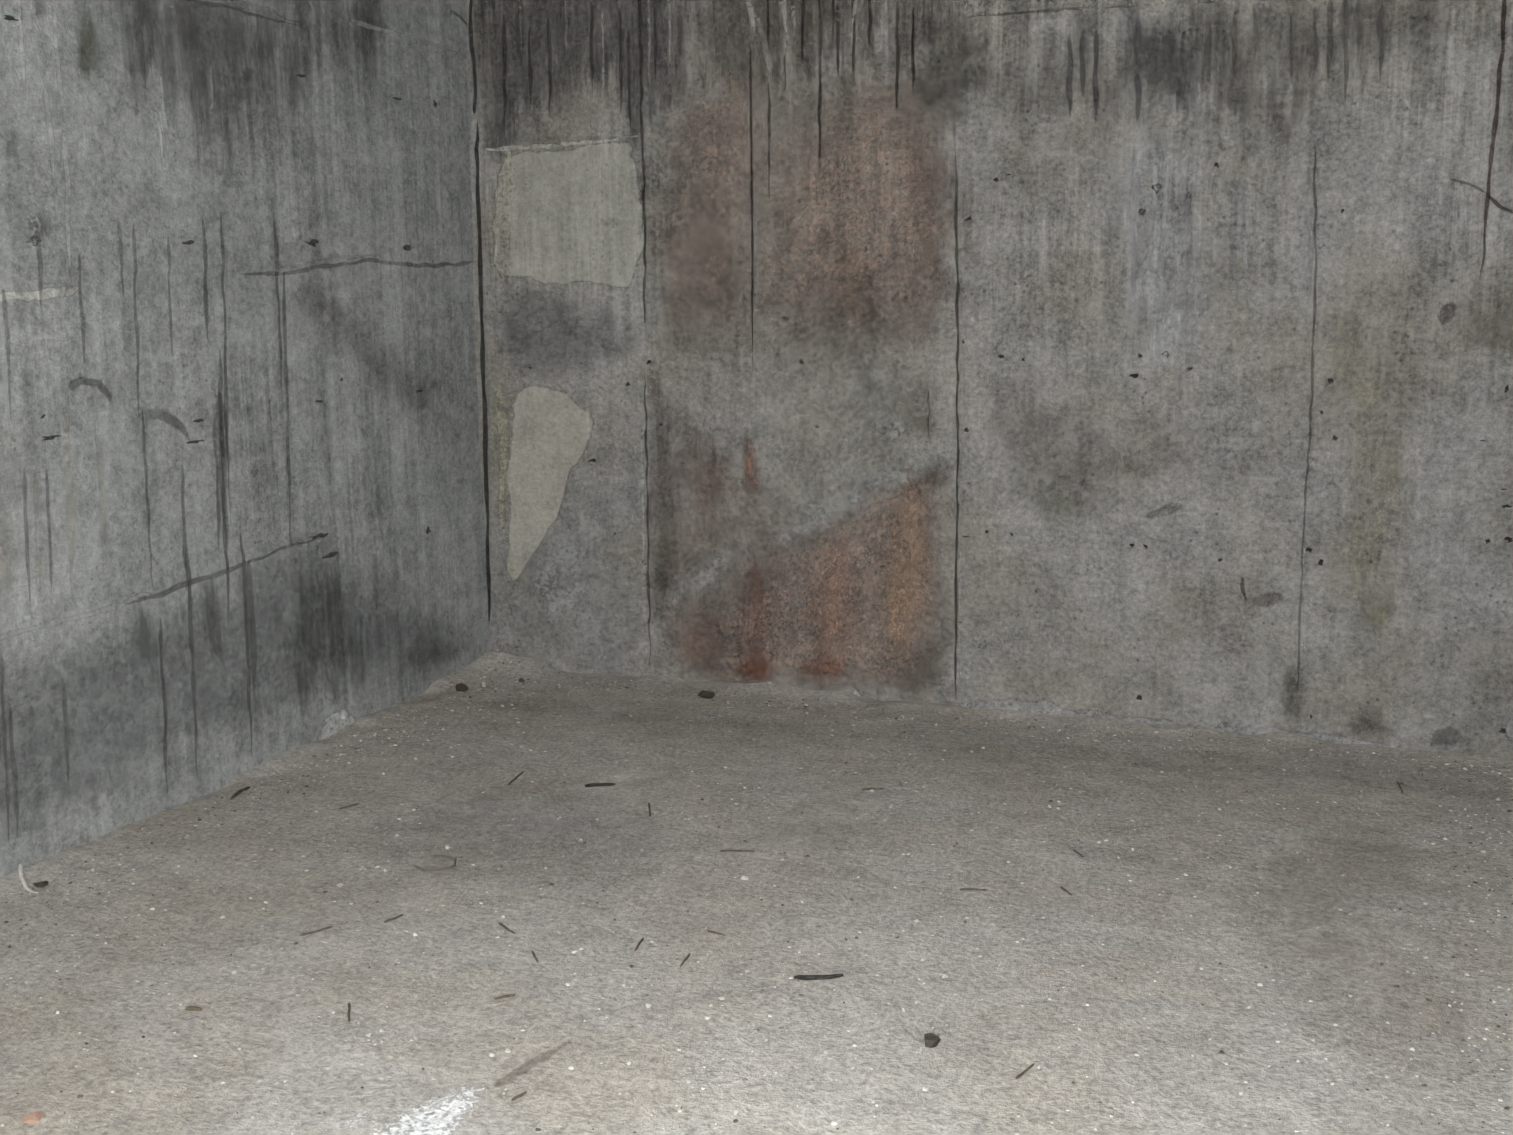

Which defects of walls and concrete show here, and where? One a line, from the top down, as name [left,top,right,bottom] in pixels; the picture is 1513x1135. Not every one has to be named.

damp [0,0,82,302]
damp [128,0,377,181]
peeling [486,135,644,288]
damp [479,0,980,187]
damp [1066,31,1099,117]
damp [1240,0,1384,126]
damp [69,377,111,400]
damp [202,220,227,383]
damp [276,281,287,364]
damp [181,403,250,666]
peeling [495,367,597,581]
damp [318,709,355,741]